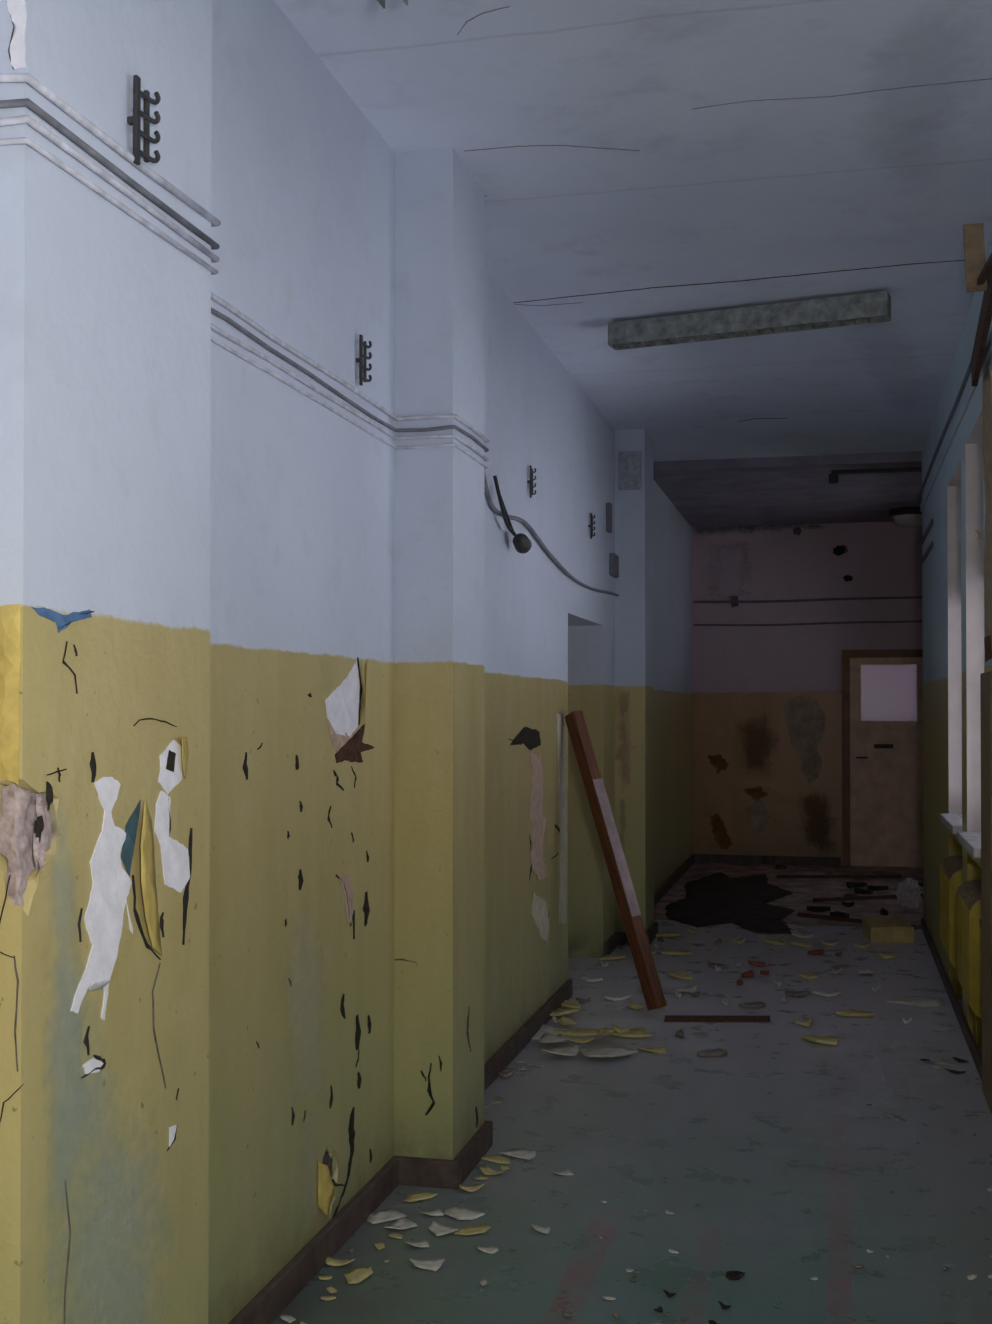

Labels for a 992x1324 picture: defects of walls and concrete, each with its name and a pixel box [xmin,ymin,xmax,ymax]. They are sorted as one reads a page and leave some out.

crack [0,604,21,785]
spalling [0,767,67,908]
peeling [31,607,95,694]
peeling [70,718,193,1079]
peeling [242,743,263,780]
peeling [308,657,375,791]
peeling [509,713,567,943]
peeling [340,993,371,1089]